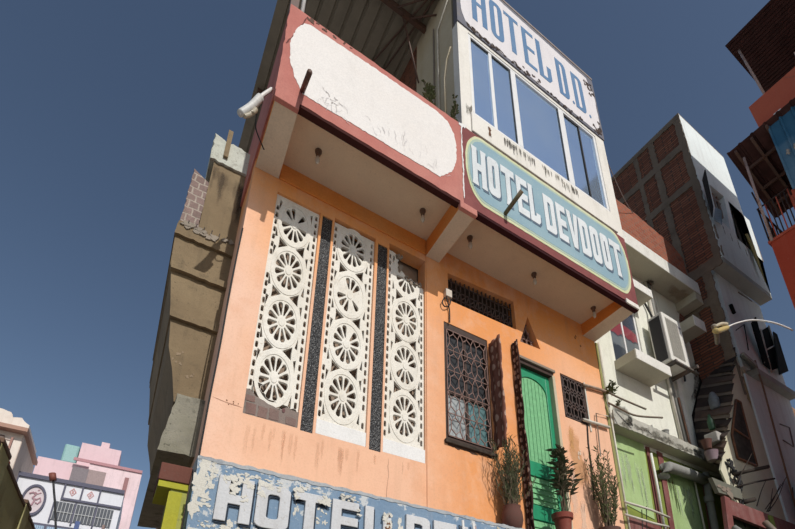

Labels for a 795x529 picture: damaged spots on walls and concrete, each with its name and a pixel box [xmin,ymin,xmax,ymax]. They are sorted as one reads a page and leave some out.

leakage [504,138,578,194]
peeling [187,459,362,529]
peeling [382,512,403,529]